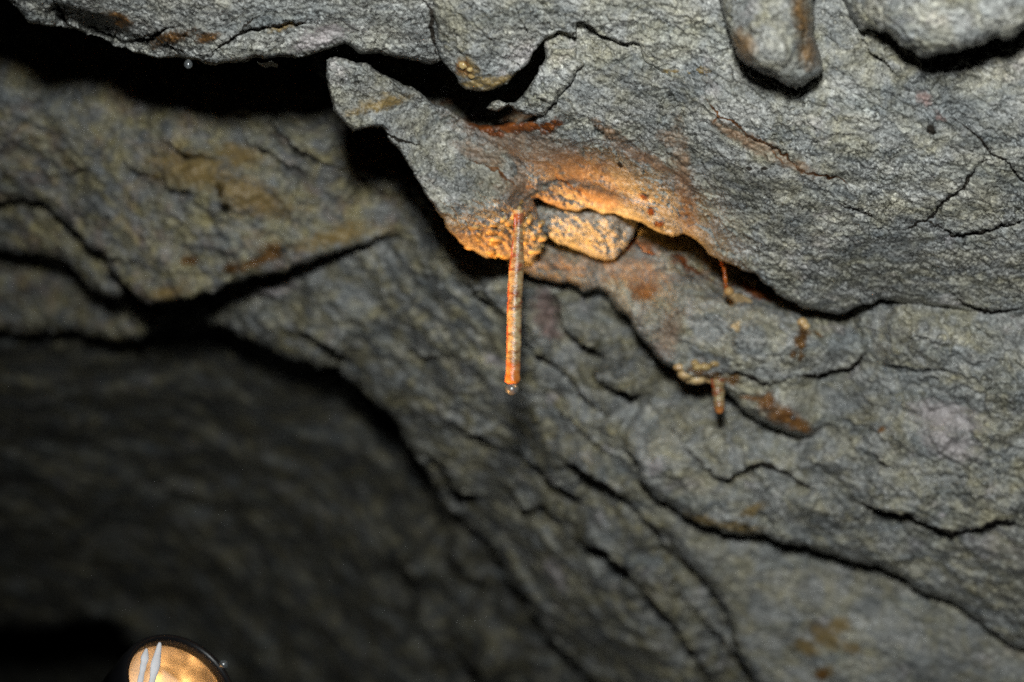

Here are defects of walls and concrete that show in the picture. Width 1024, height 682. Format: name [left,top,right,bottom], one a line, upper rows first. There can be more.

corrosion [469,119,563,138]
crack [846,119,1024,237]
corrosion [670,254,777,301]
corrosion [688,367,740,390]